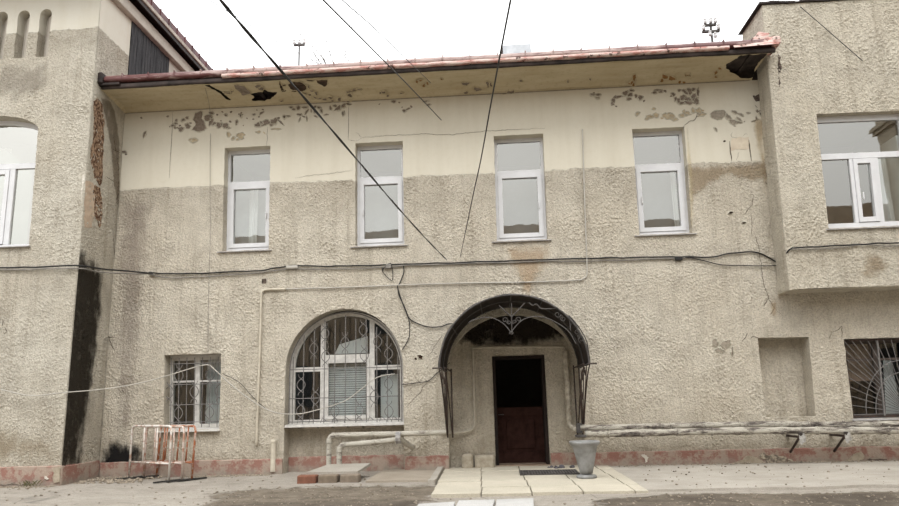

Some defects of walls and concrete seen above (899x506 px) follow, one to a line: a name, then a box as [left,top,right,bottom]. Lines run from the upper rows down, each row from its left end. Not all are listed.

flaking render [90,98,105,228]
peeling [166,79,363,144]
peeling [589,87,761,132]
leakage [62,253,102,466]